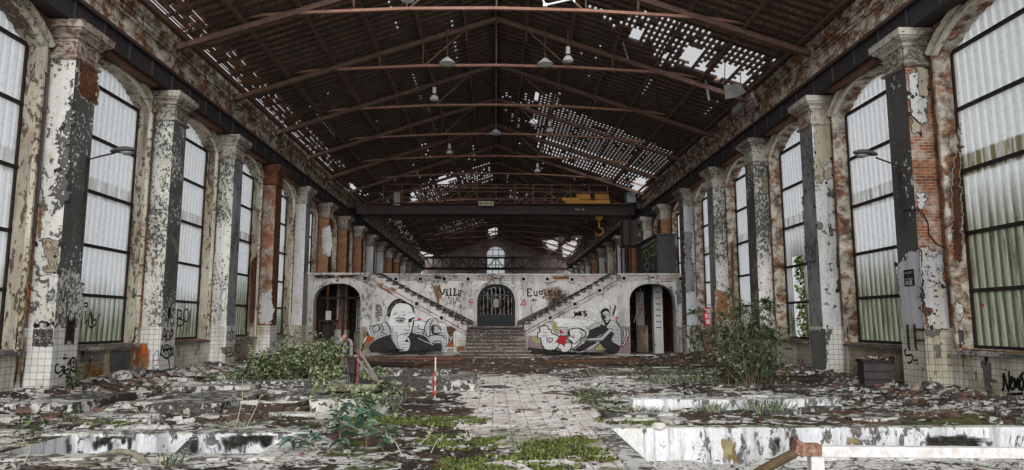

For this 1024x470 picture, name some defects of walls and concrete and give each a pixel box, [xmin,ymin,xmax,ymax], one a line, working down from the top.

peeling [48,62,100,207]
flaking render [906,67,931,136]
peeling [32,237,86,347]
flaking render [249,252,275,325]
peeling [801,125,833,263]
flaking render [894,123,965,345]
rust [133,344,149,368]
spalling [612,427,1024,470]